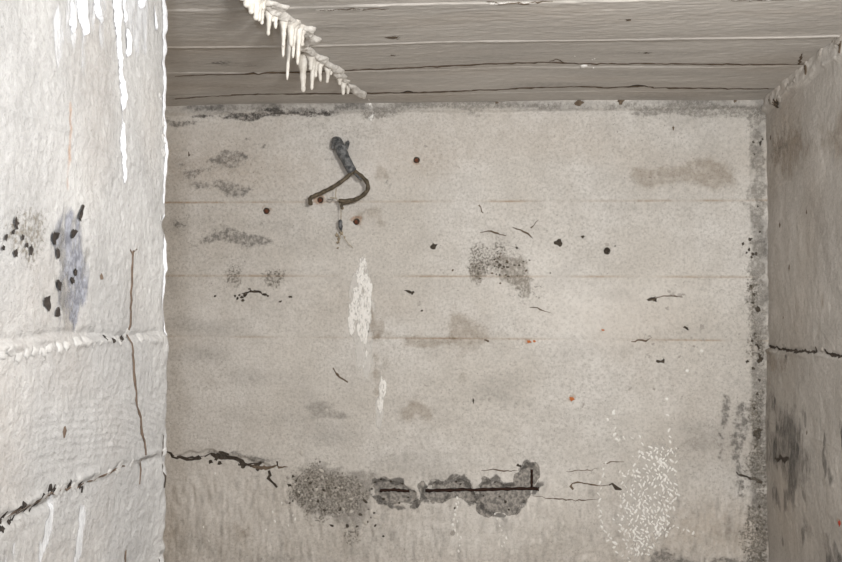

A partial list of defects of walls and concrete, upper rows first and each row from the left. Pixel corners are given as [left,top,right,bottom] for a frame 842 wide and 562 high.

water stain [54,0,213,204]
water stain [226,0,375,121]
crack [126,243,147,484]
water stain [348,257,374,379]
water stain [469,237,531,284]
crack [769,345,842,358]
crack [167,451,287,488]
spalling [369,460,543,517]
water stain [597,410,695,562]